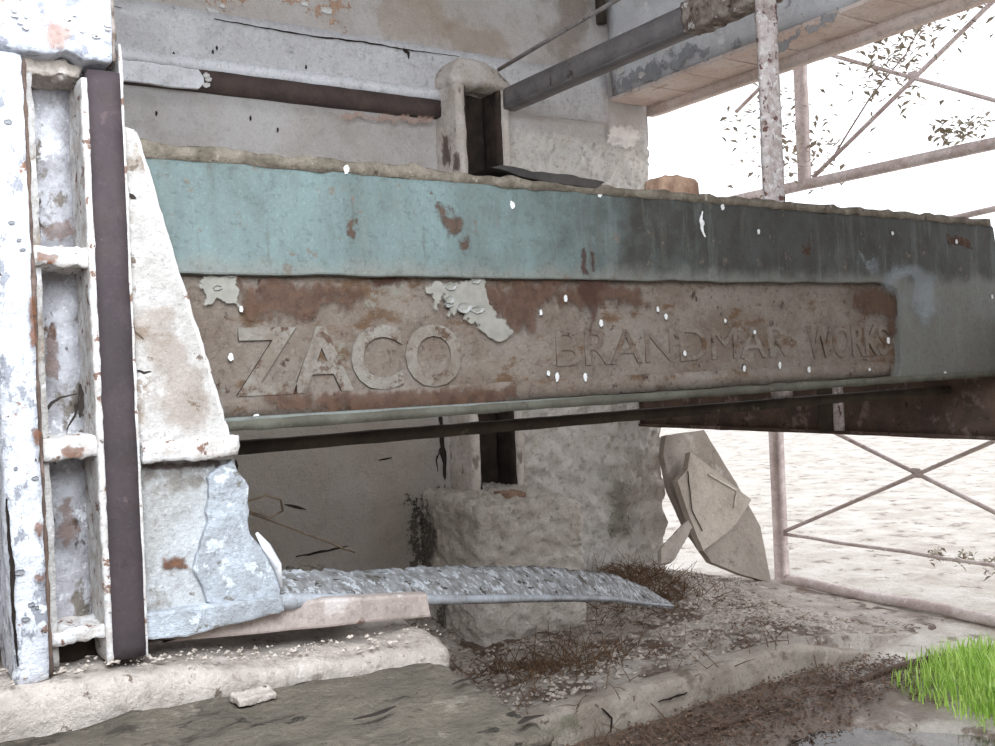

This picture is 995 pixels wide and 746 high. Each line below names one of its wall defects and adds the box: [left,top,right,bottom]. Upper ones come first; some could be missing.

peeling [617,0,755,93]
peeling [778,7,839,53]
rust [436,201,469,250]
peeling [199,275,240,307]
peeling [425,278,513,342]
rust [486,249,649,332]
peeling [109,44,230,656]
rust [163,557,189,569]